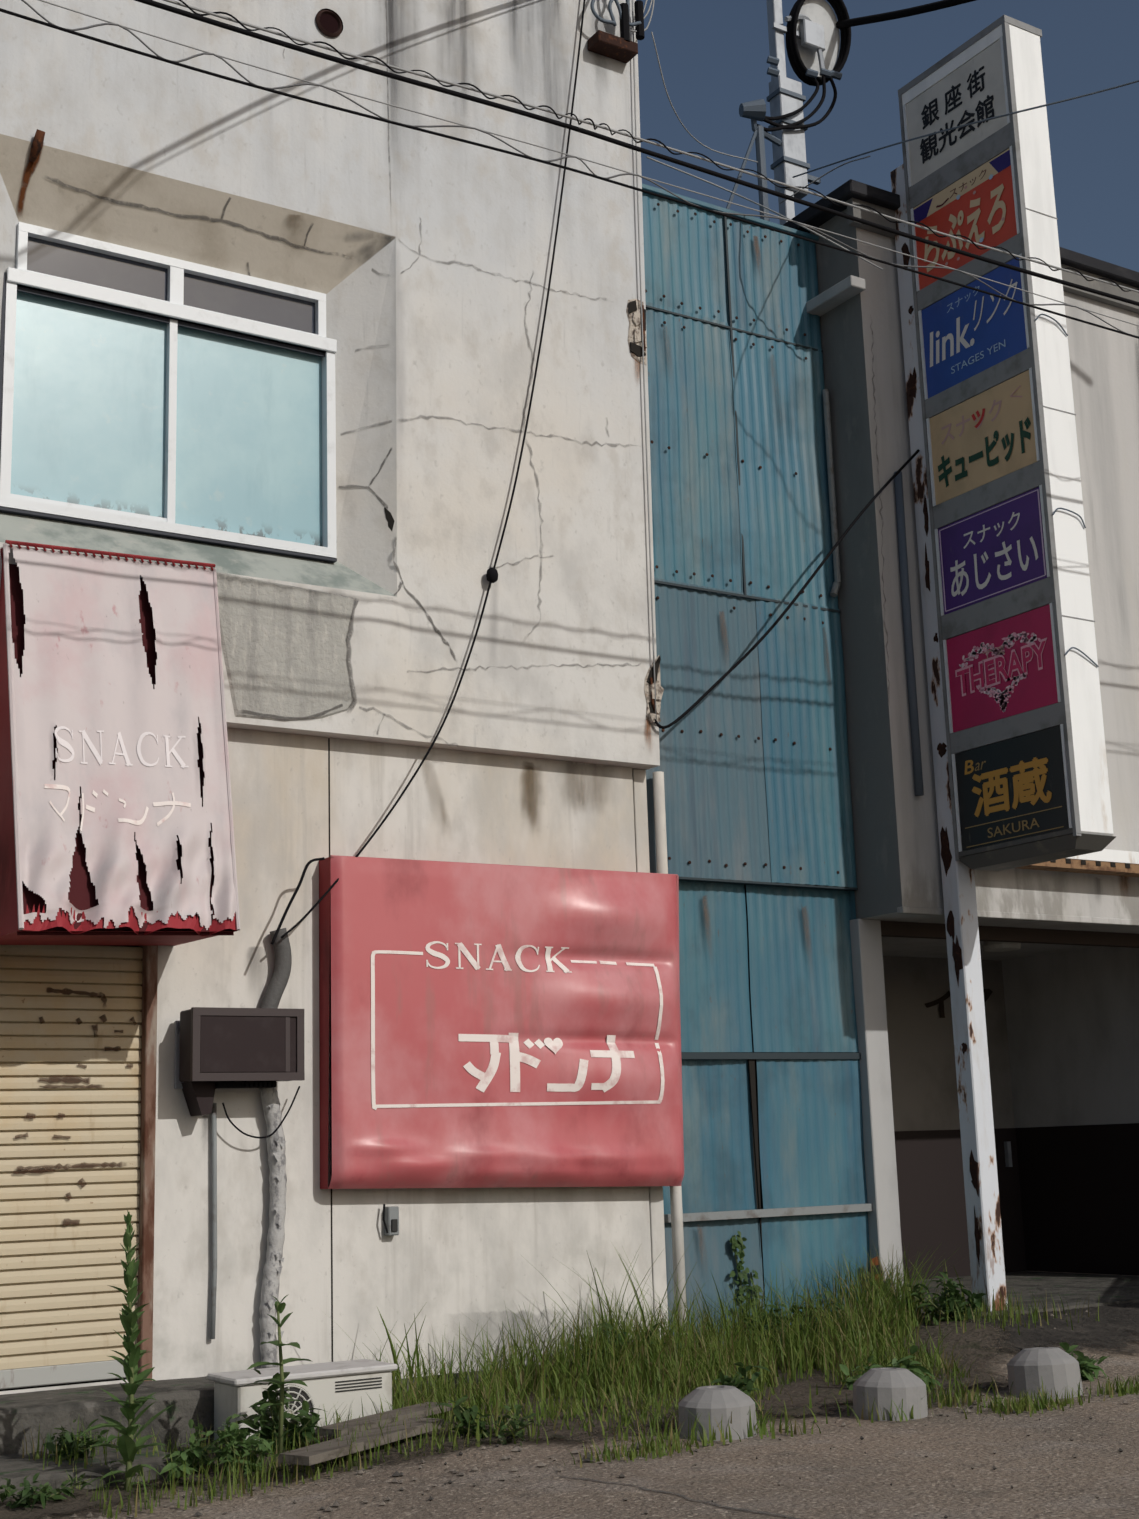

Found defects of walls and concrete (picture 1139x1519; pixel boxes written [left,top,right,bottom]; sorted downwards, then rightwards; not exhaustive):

rust [18,129,45,213]
crack [50,179,324,276]
crack [339,422,483,673]
crack [497,435,616,576]
crack [242,599,409,734]